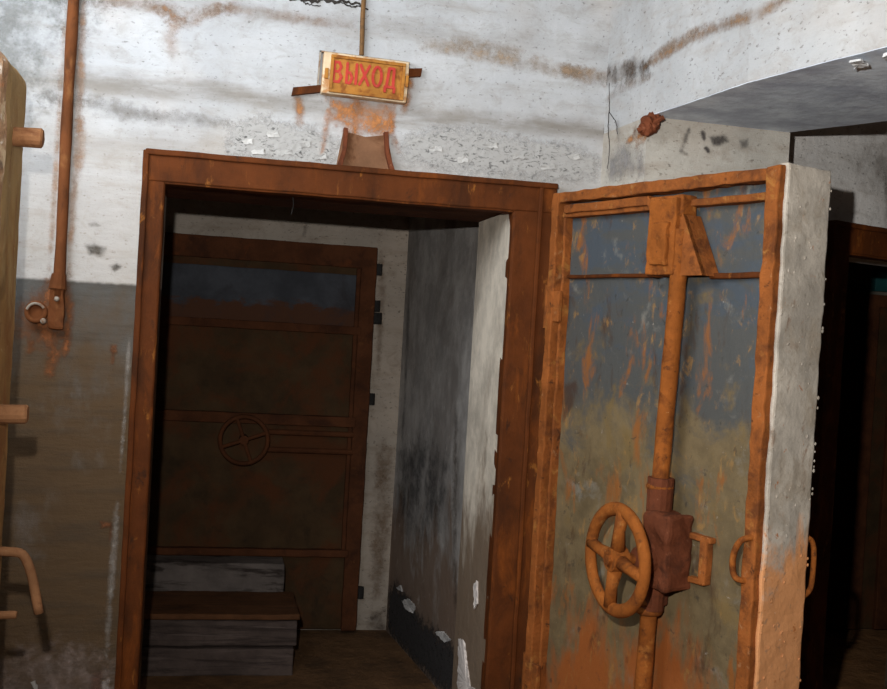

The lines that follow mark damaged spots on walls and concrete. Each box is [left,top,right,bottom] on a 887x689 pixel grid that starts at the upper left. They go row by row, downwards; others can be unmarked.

water stain [562,67,588,77]
water stain [607,15,748,81]
rust [330,99,394,135]
spalling [387,583,475,689]